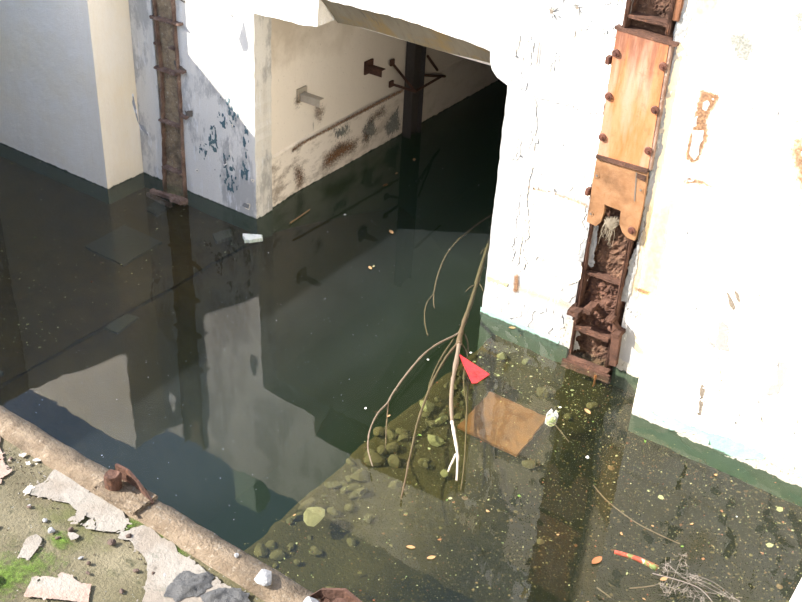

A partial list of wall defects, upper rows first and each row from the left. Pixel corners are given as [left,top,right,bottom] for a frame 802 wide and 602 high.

peeling [597,0,632,25]
rust [323,131,370,168]
rust [292,89,404,152]
peeling [528,2,615,302]
rust [686,89,719,163]
rust [789,138,802,189]
peeling [621,0,765,460]
peeling [479,307,559,345]
peeling [0,449,12,484]
peeling [15,469,250,602]